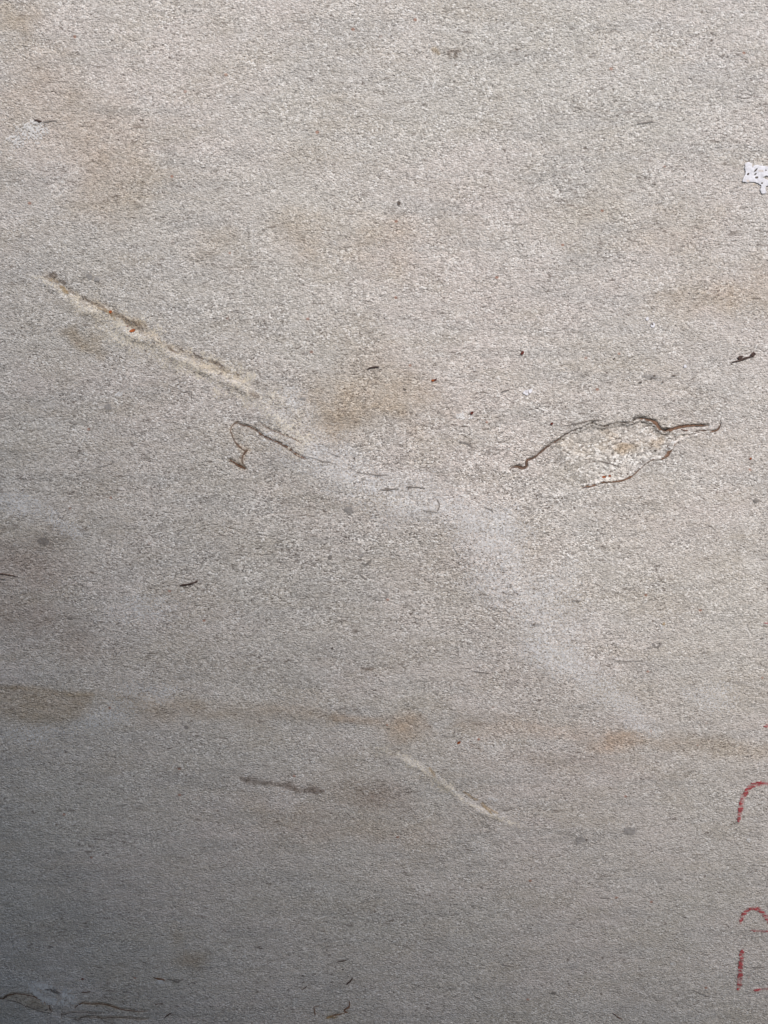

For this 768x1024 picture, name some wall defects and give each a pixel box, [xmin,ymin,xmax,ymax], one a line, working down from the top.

crack [230,421,389,476]